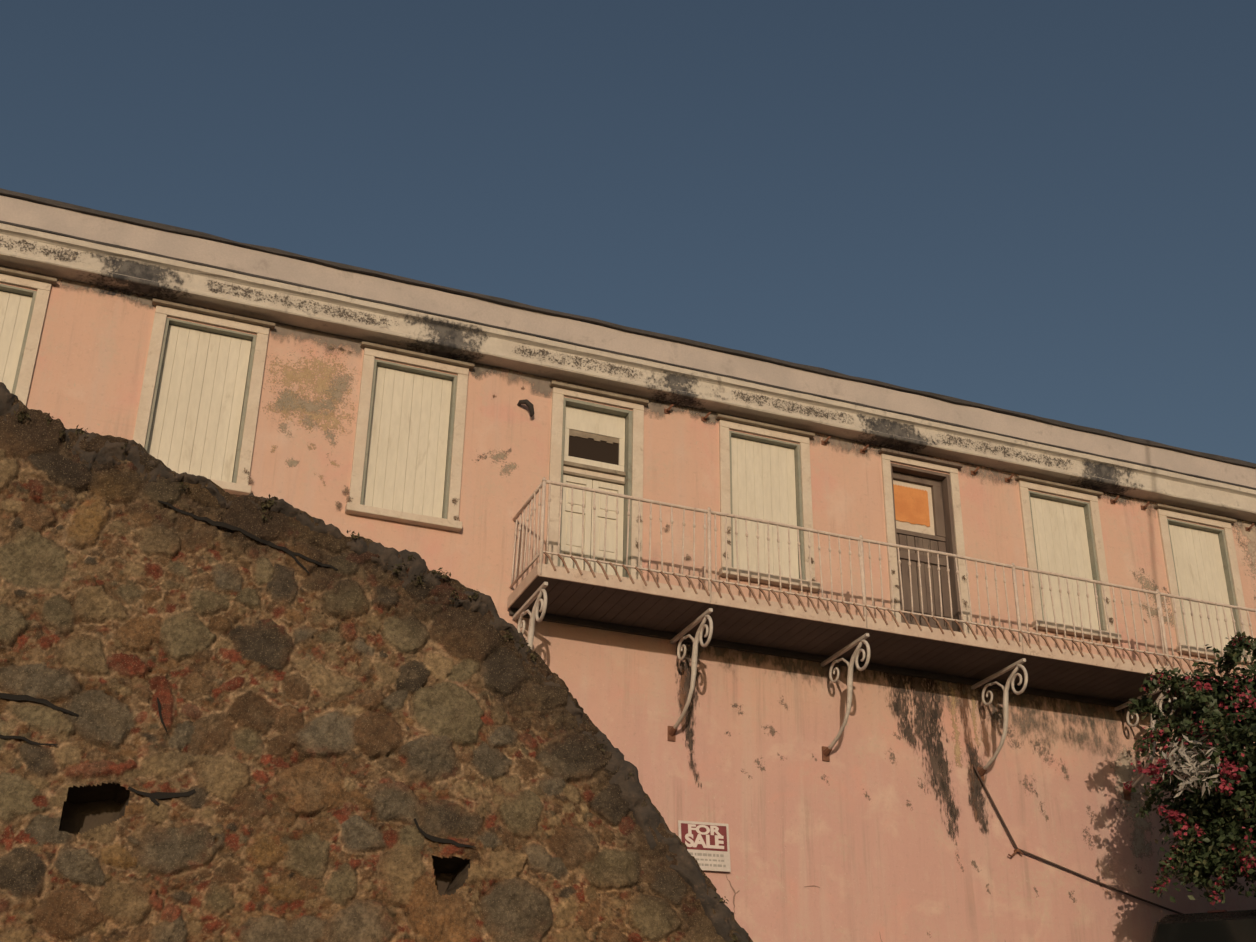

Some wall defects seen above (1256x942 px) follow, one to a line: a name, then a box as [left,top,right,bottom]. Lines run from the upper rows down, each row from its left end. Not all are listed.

flaking render [262,346,355,466]
water stain [0,236,1184,510]
water stain [678,642,1125,872]
crack [726,875,739,913]